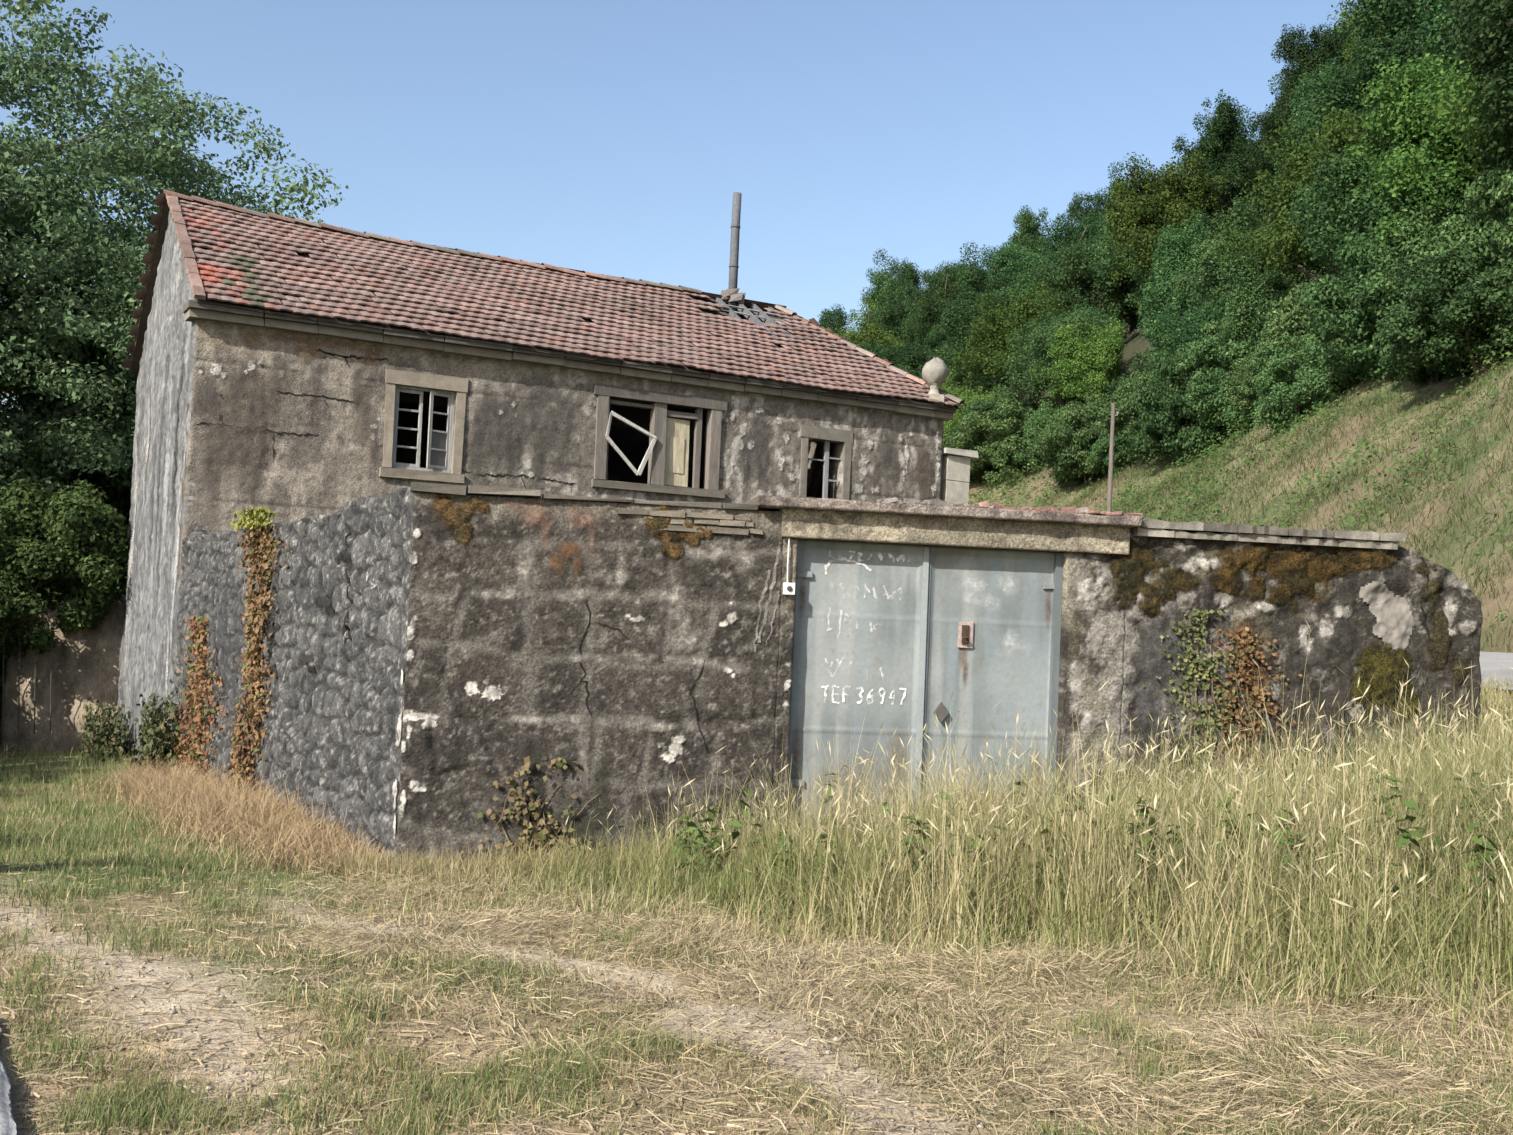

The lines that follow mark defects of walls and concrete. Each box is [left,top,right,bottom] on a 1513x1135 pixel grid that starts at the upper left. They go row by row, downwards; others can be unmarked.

peeling [465,680,503,701]
crack [567,597,632,719]
peeling [658,736,685,763]
crack [675,657,709,754]